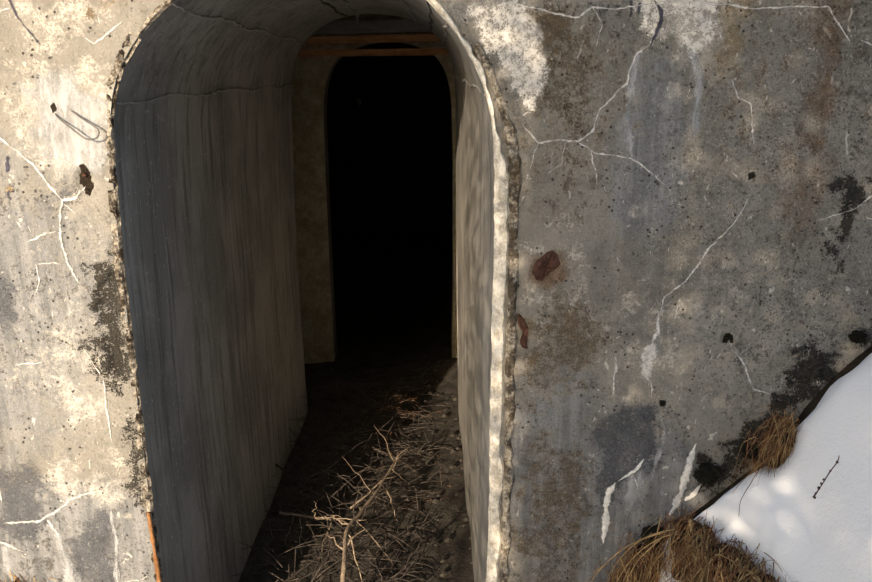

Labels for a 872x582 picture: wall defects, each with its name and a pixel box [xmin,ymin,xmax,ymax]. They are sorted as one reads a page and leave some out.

crack [0,0,39,43]
crack [506,0,871,185]
crack [0,138,86,296]
crack [817,195,872,221]
spalling [465,0,551,582]
corrosion [532,250,561,281]
crack [659,194,751,316]
corrosion [517,313,529,349]
crack [83,348,112,441]
crack [735,352,785,404]
crack [0,491,96,552]